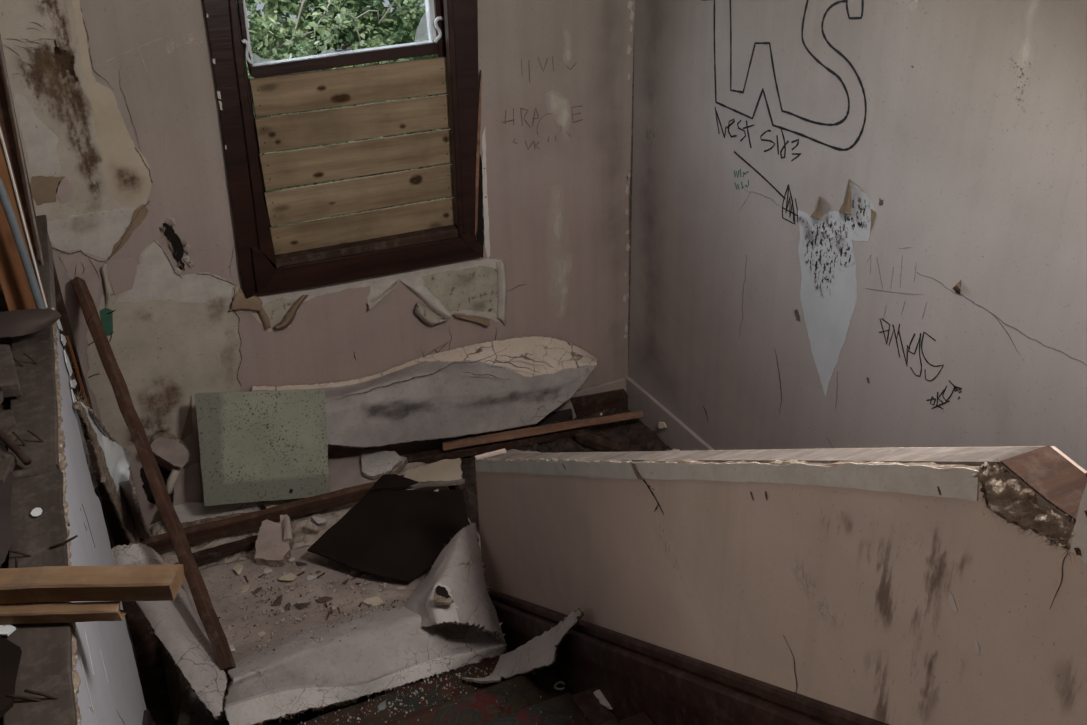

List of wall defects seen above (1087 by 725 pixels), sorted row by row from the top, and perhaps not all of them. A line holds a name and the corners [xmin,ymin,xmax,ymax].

peeling [0,0,153,262]
peeling [52,308,137,453]
peeling [97,217,242,441]
peeling [259,126,507,332]
peeling [794,179,884,396]
spalling [140,467,156,504]
spalling [157,463,171,485]
crack [630,463,664,515]
spalling [970,457,1082,564]